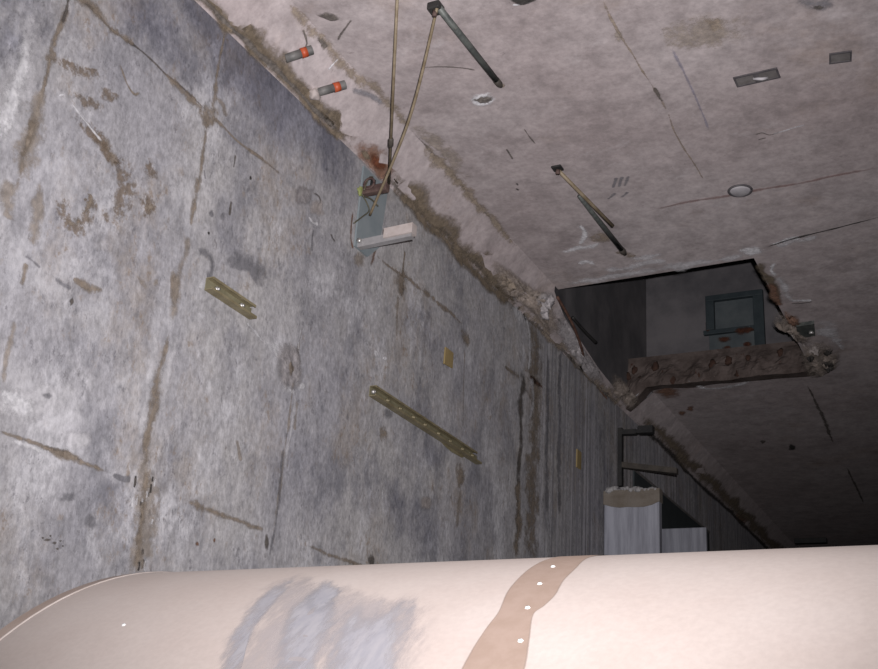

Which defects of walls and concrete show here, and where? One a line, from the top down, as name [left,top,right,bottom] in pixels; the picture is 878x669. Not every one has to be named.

crack [80,0,279,173]
leakage [190,0,345,225]
leakage [292,7,407,124]
rust [359,145,393,182]
crack [605,6,702,177]
leakage [575,247,761,283]
crack [771,220,868,247]
leakage [392,182,621,556]
spalling [556,296,598,372]
crack [3,432,130,482]
crack [190,500,269,548]
leakage [644,421,780,549]